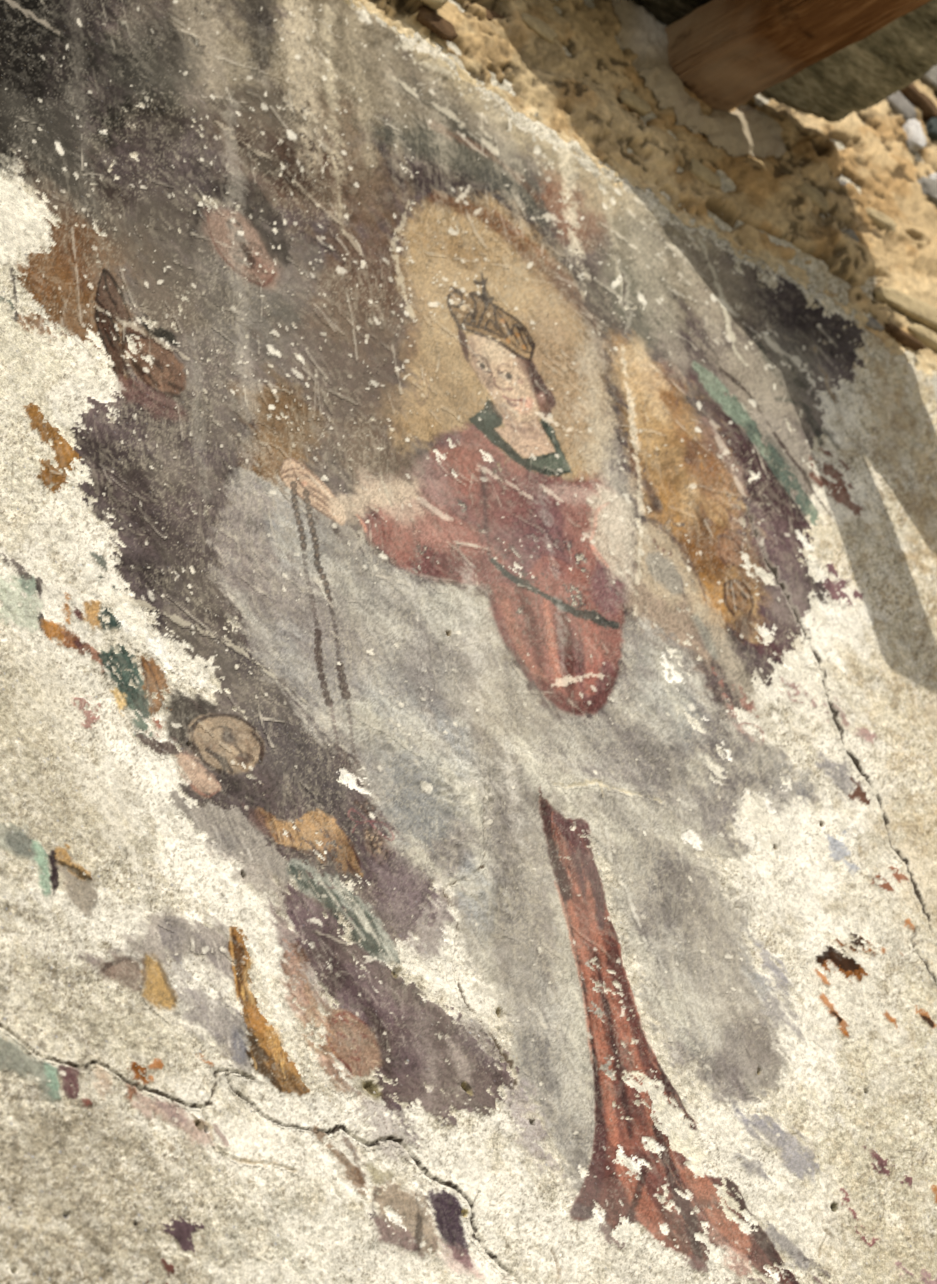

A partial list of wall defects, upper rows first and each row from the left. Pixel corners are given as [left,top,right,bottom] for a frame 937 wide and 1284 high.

peeling [55,457,270,785]
peeling [652,621,813,879]
crack [745,504,937,987]
peeling [819,765,872,859]
peeling [870,865,908,894]
peeling [337,948,413,1021]
flaking render [315,1051,383,1100]
crack [0,1019,564,1284]
peeling [859,1143,913,1189]
peeling [145,1214,205,1284]
peeling [332,1169,409,1256]
peeling [830,1186,882,1248]